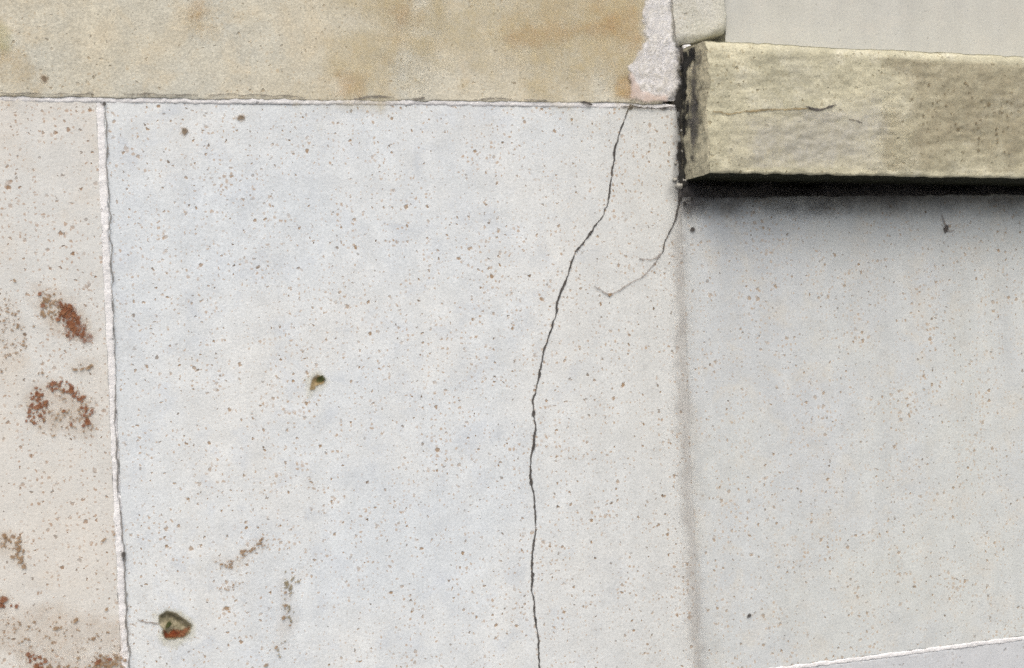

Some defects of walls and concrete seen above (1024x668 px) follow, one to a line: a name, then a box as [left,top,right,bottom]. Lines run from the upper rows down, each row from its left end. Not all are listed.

crack [354,93,425,101]
corrosion [0,291,92,373]
corrosion [25,364,94,437]
crack [529,104,681,668]